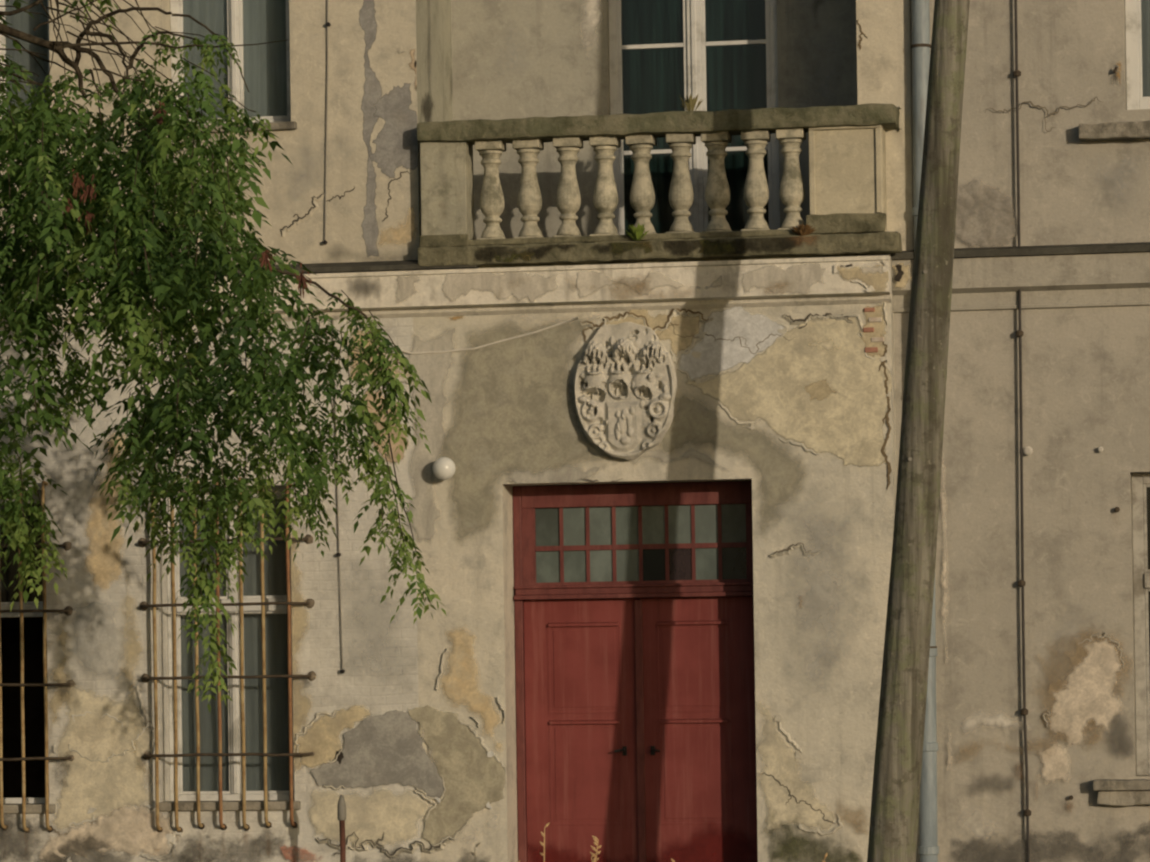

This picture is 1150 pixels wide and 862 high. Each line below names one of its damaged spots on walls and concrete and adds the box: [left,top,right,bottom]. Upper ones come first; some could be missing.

crack [280,0,411,256]
crack [580,308,853,354]
flaking render [592,280,892,466]
crack [879,342,892,490]
flaking render [85,424,129,588]
flaking render [295,705,370,767]
peeling [1039,632,1125,782]
damp [0,813,40,862]
damp [49,836,121,862]
damp [171,831,283,862]
flaking render [310,777,446,851]
crack [759,773,837,824]